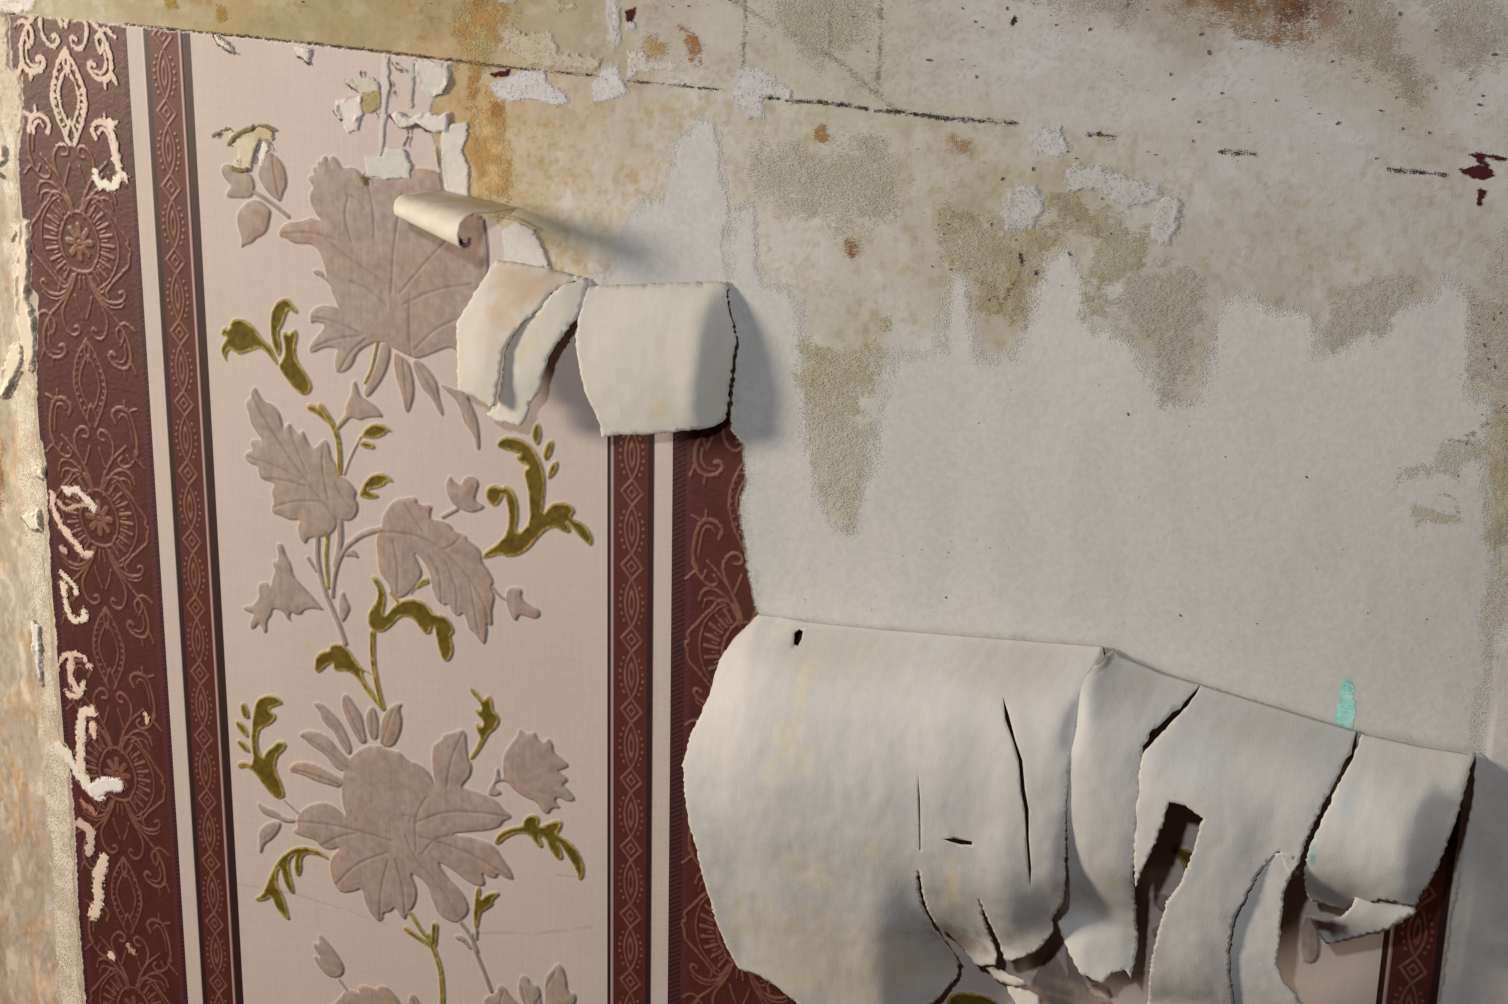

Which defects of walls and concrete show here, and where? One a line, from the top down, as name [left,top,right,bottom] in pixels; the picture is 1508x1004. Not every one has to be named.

corrosion [1160,0,1356,60]
peeling [0,220,38,399]
leakage [1075,222,1211,413]
peeling [21,508,43,534]
peeling [32,463,45,481]
leakage [791,315,891,536]
leakage [1452,200,1508,661]
peeling [30,620,43,688]